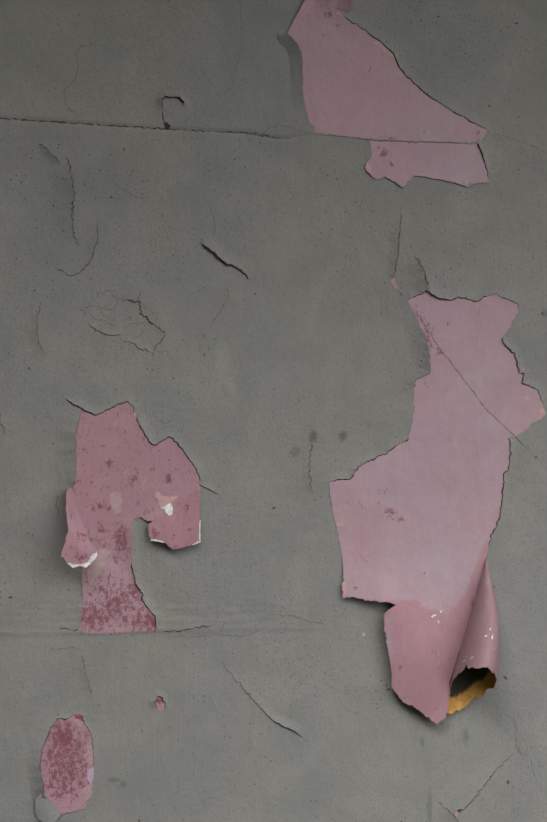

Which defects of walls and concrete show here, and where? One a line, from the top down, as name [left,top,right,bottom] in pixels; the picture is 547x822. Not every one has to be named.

crack [0,37,306,139]
peeling [276,0,496,188]
crack [169,202,259,283]
crack [80,290,165,359]
peeling [52,391,224,640]
peeling [322,280,547,724]
crack [217,656,310,738]
peeling [26,707,101,822]
crack [427,719,537,822]